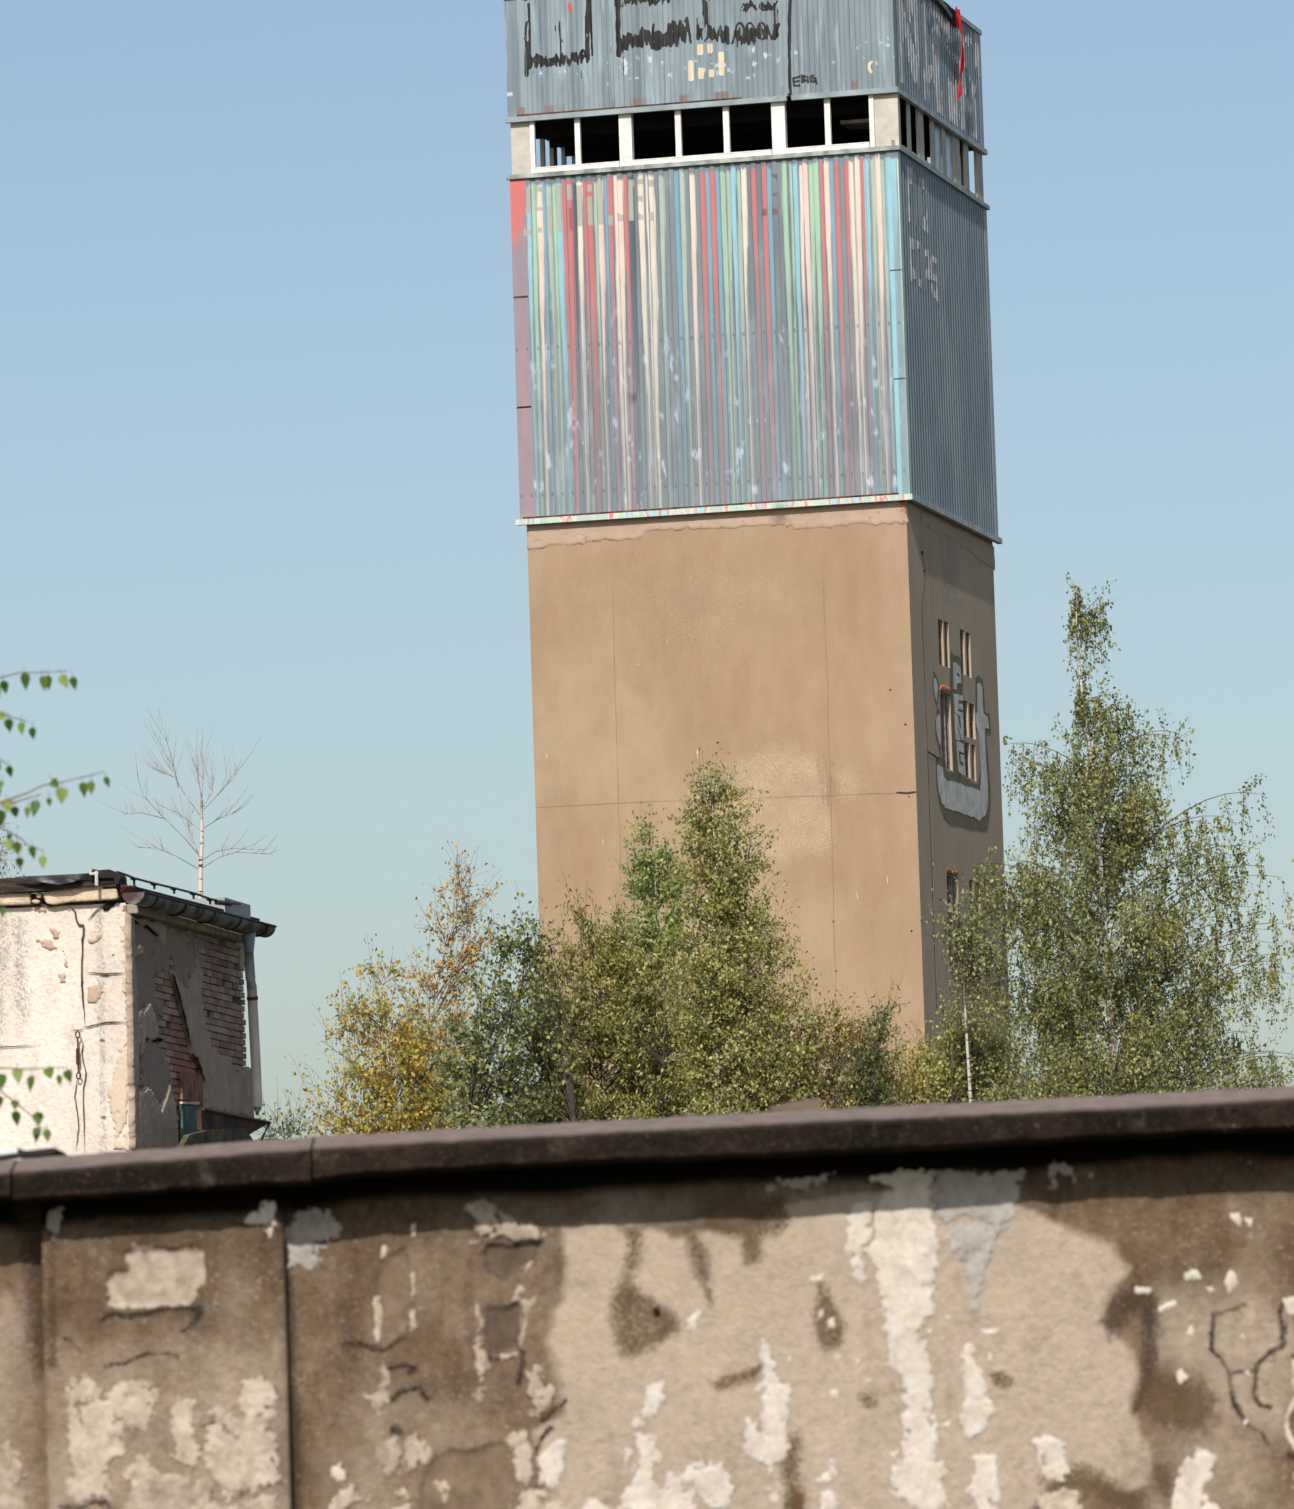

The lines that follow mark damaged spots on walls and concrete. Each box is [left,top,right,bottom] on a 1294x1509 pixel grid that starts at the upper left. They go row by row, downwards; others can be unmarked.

crack [32,900,206,1150]
flaking render [100,902,255,1151]
spalling [104,1243,206,1309]
peeling [62,1373,282,1509]
peeling [244,1200,342,1272]
peeling [463,1197,735,1509]
damp [604,1224,682,1361]
peeling [844,1168,1026,1509]
peeling [1027,1417,1085,1509]
damp [1094,1282,1225,1436]
peeling [1171,1445,1220,1509]
crack [1207,1302,1294,1462]